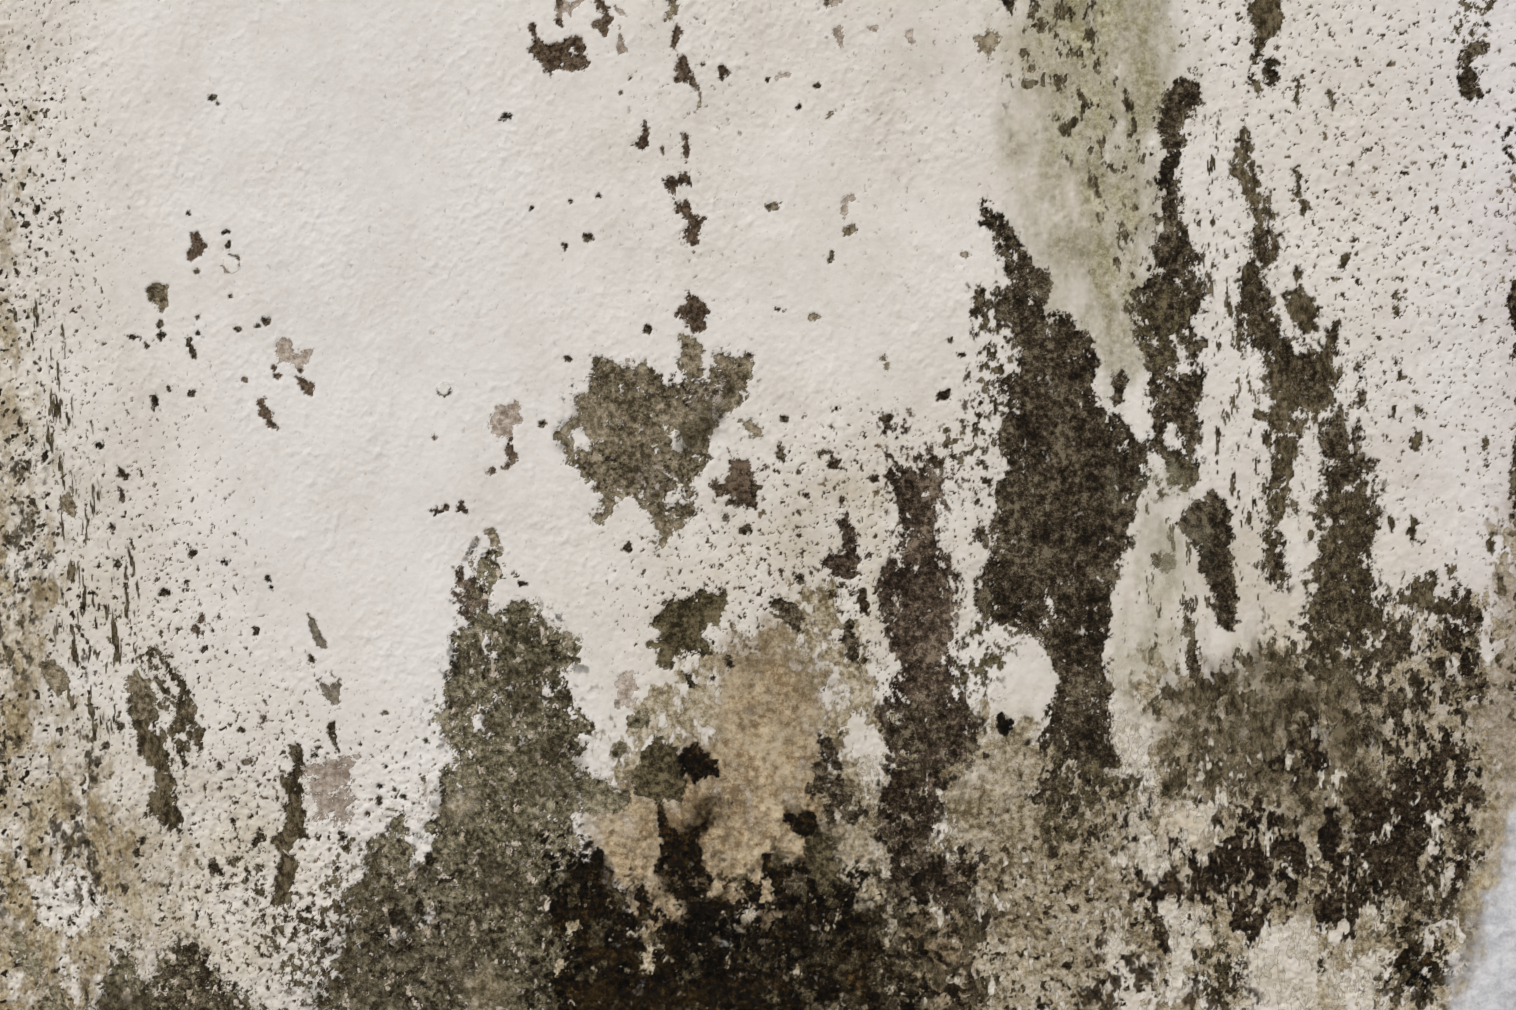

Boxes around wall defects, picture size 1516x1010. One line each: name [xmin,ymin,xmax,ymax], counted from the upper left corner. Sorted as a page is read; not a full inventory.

peeling [528,0,627,76]
peeling [664,0,730,113]
peeling [631,120,664,155]
peeling [561,233,595,252]
peeling [662,133,707,254]
peeling [827,194,858,263]
peeling [487,290,801,551]
peeling [936,388,951,401]
peeling [816,449,842,469]
water stain [518,0,1516,1010]
water stain [0,83,157,1010]